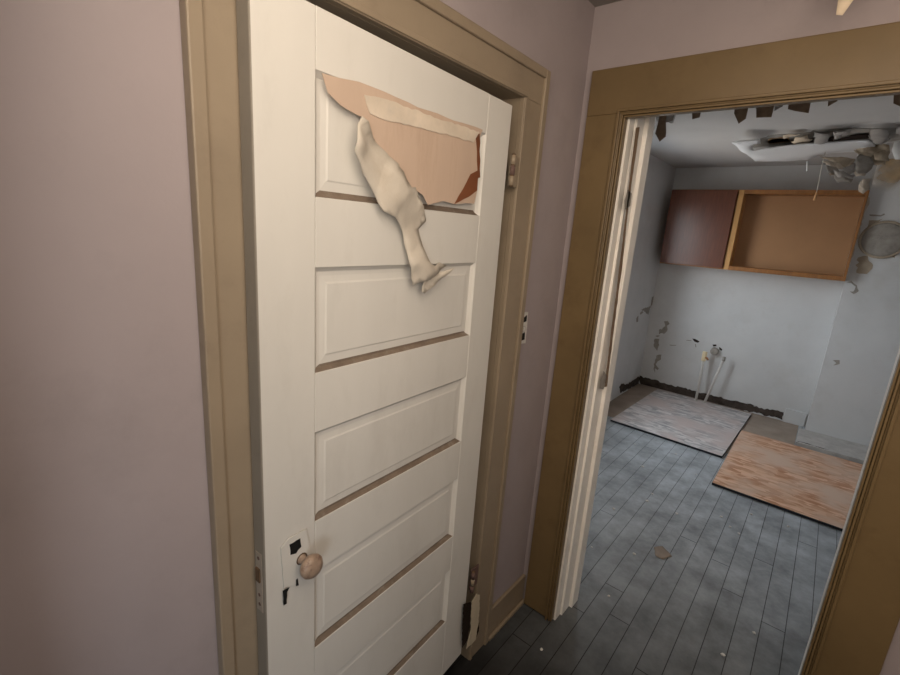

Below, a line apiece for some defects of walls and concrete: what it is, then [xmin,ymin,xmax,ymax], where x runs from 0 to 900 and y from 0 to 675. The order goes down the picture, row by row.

peeling [655,115,676,142]
peeling [734,103,811,124]
flaking render [820,144,890,274]
peeling [654,321,669,372]